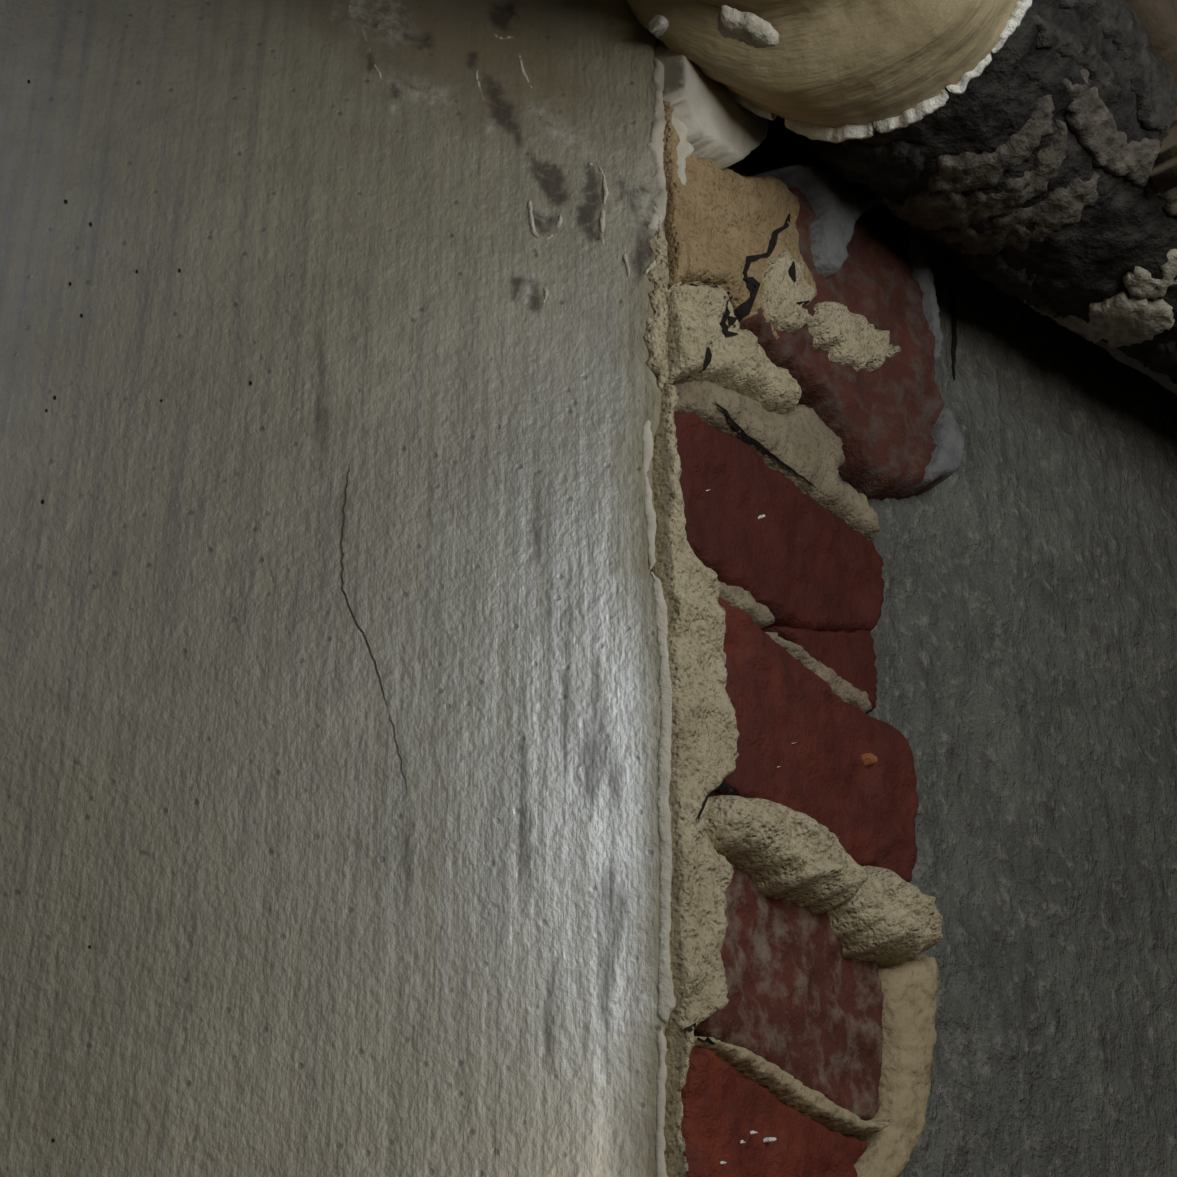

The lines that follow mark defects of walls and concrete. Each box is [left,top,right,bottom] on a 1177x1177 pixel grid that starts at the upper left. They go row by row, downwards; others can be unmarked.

peeling [527,162,566,240]
peeling [580,163,609,244]
crack [681,213,810,371]
crack [714,401,816,488]
crack [341,463,407,788]
flaking render [622,0,1032,1177]